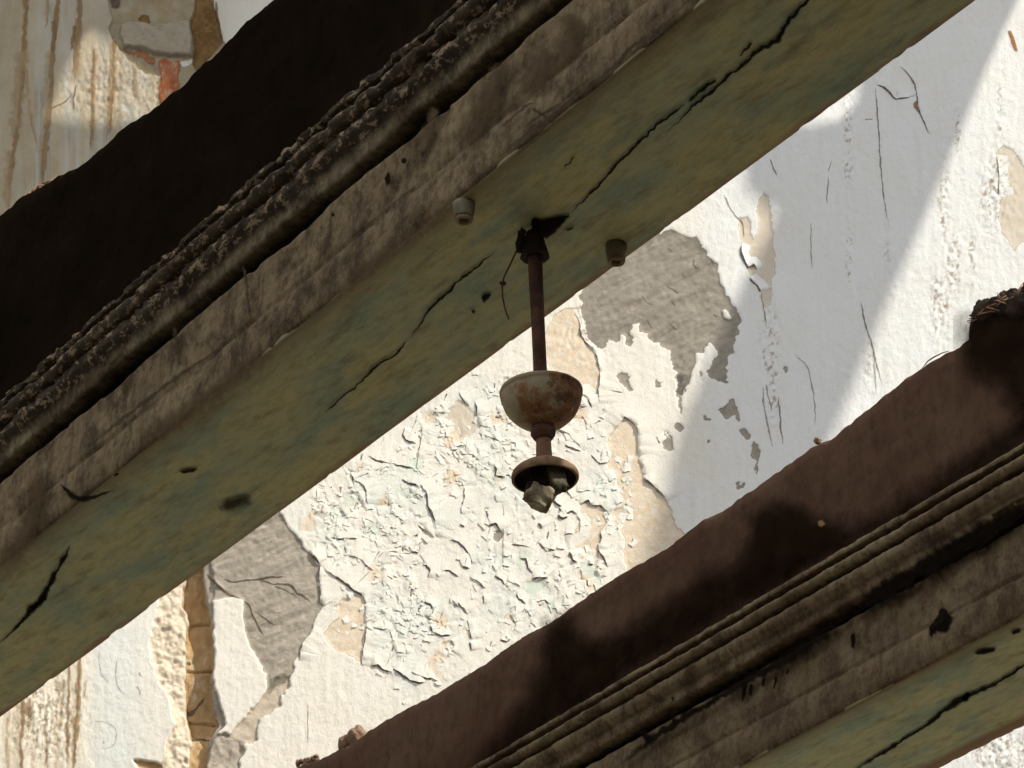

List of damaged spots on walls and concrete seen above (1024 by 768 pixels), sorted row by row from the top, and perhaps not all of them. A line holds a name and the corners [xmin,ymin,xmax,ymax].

leakage [4,0,60,199]
leakage [71,0,83,73]
leakage [89,41,116,142]
flaking render [108,0,225,107]
crack [575,0,810,209]
crack [865,71,925,216]
peeling [738,194,775,307]
peeling [996,145,1024,250]
spalling [703,399,761,474]
flaking render [208,230,741,768]
crack [2,547,69,641]
crack [858,665,1024,768]